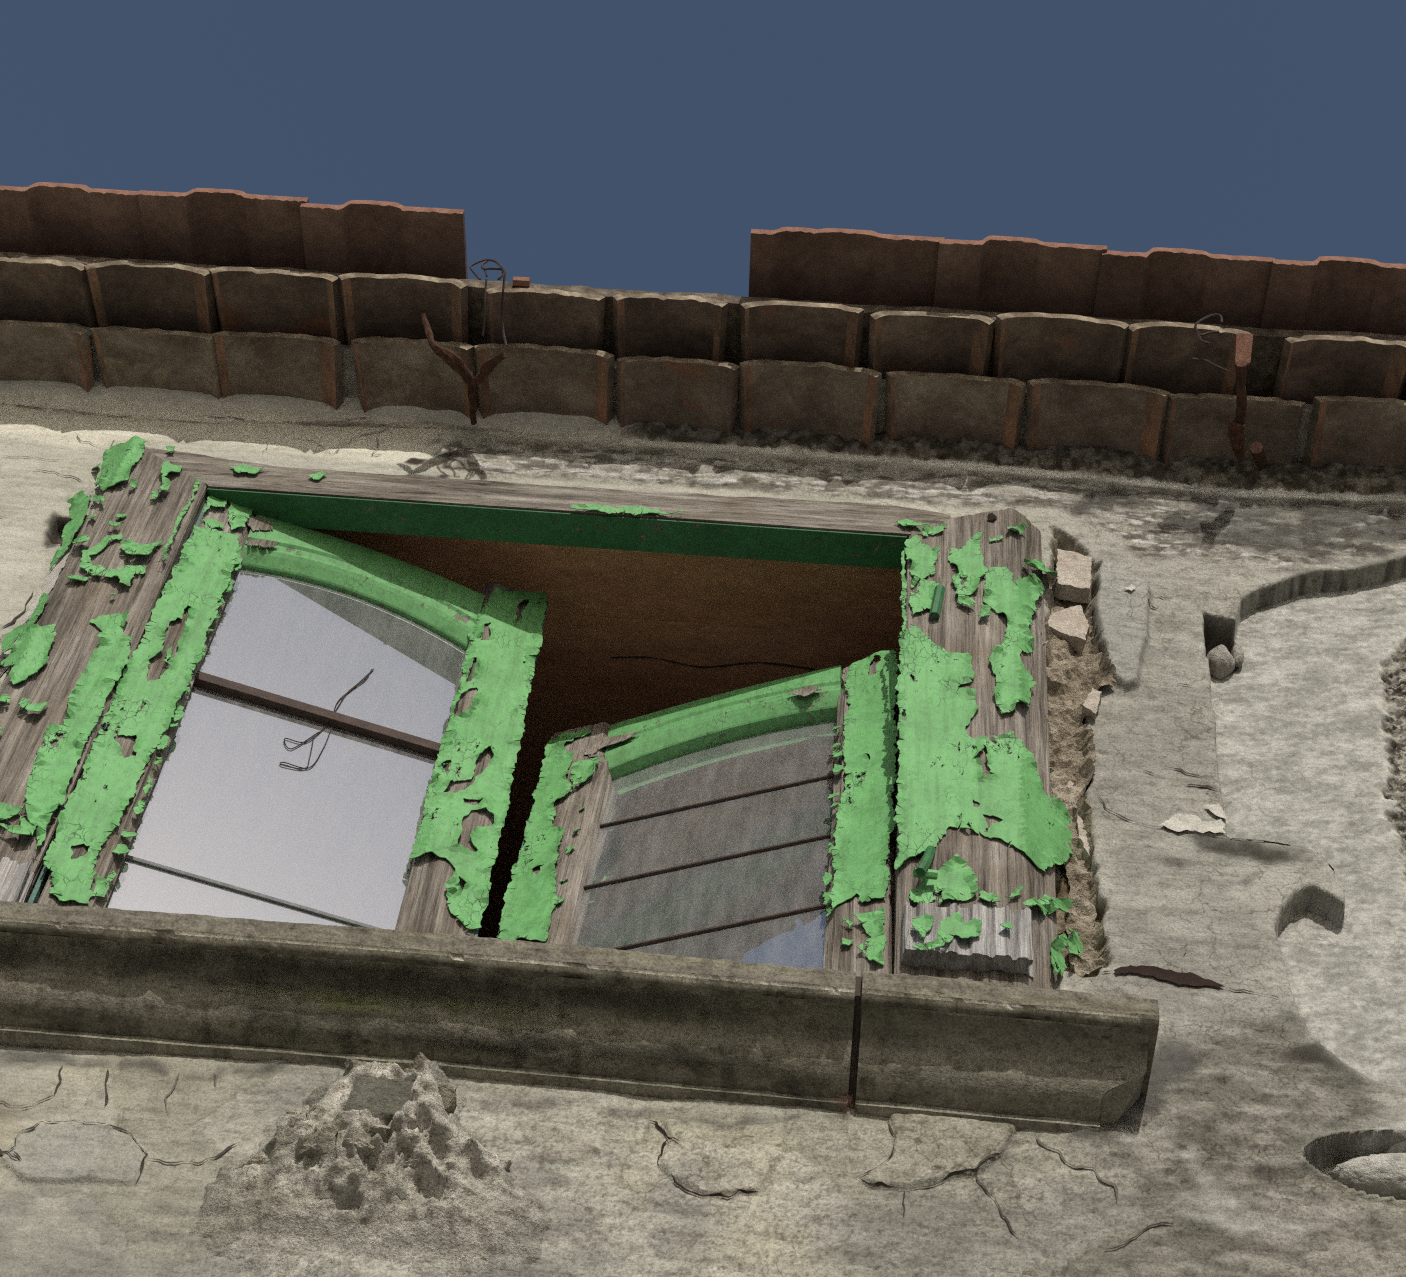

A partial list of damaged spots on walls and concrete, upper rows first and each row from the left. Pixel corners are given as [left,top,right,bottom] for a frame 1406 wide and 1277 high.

peeling [570,503,683,516]
peeling [0,435,280,904]
peeling [788,685,821,697]
peeling [409,588,641,942]
peeling [822,519,1117,978]
flaking render [1158,804,1227,833]
crack [0,1066,239,1184]
crack [649,1120,757,1198]
crack [860,1117,1020,1237]
crack [1035,1134,1118,1200]
crack [1105,1222,1174,1250]